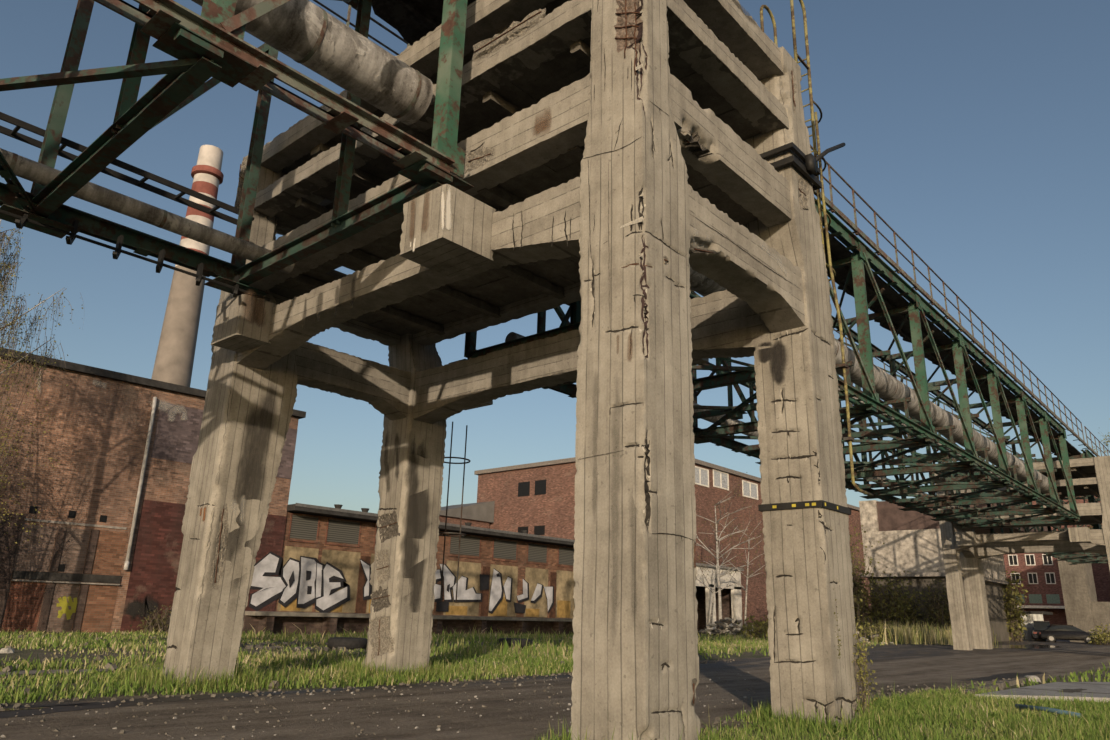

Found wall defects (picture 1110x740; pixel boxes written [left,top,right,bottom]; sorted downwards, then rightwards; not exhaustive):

spalling [614,0,643,75]
spalling [682,130,713,159]
damp [759,342,786,383]
crack [774,328,830,345]
damp [228,390,275,561]
crack [771,375,837,584]
damp [385,435,428,612]
crack [773,607,815,663]
crack [807,697,857,720]